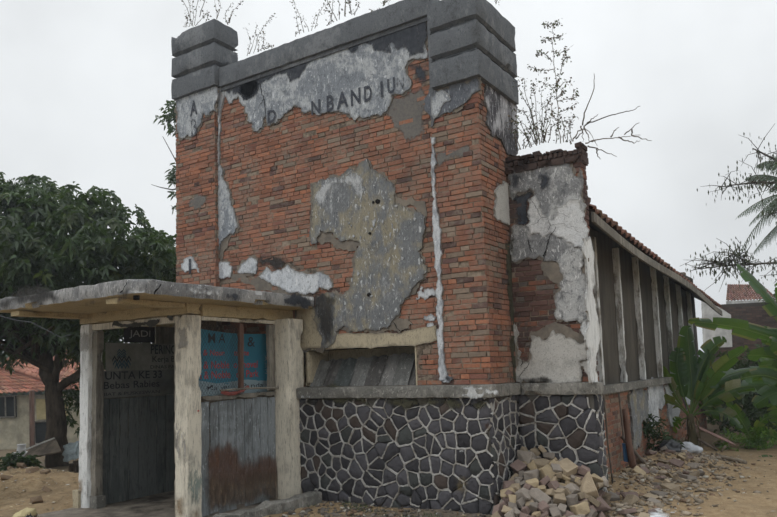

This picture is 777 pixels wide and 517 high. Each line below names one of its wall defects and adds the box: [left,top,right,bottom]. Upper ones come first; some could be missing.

peeling [181,256,200,273]
peeling [174,22,428,250]
peeling [219,77,519,383]
peeling [493,163,601,384]
crack [528,201,576,260]
water stain [209,472,278,509]